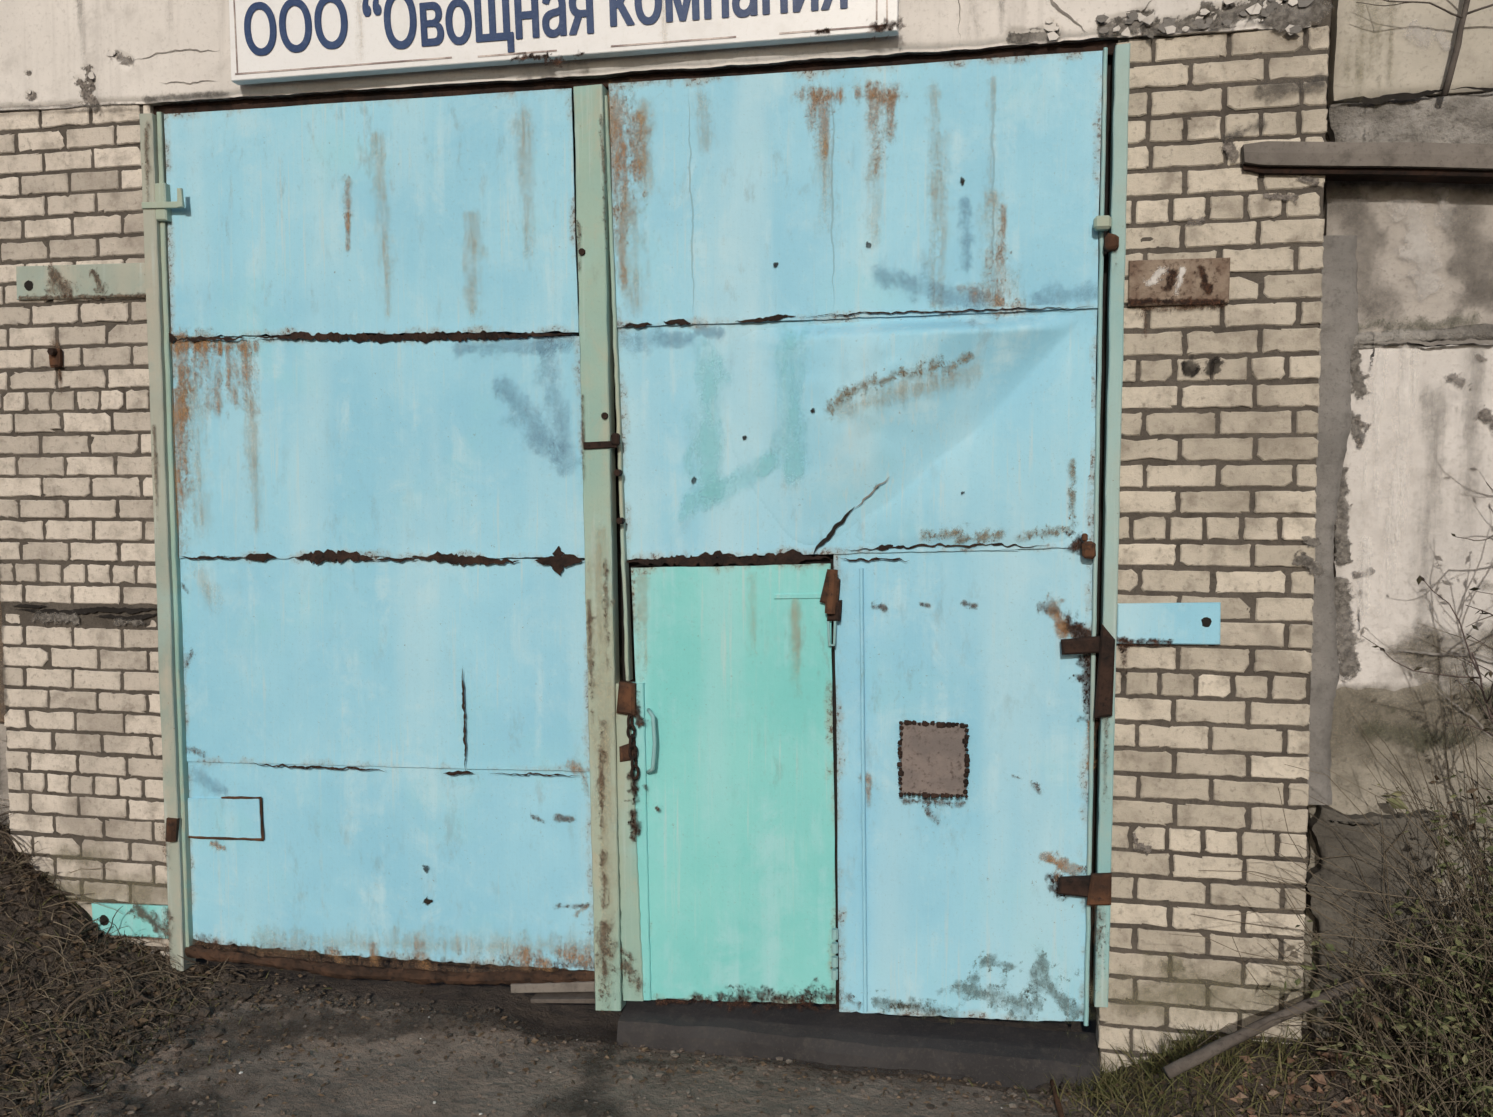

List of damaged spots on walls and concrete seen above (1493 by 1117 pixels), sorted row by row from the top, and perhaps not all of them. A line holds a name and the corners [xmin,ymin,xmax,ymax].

crack [1050,0,1086,32]
spalling [1096,0,1334,38]
rust [810,88,897,156]
water stain [1394,187,1492,302]
rust [195,563,647,1011]
rust [656,978,861,1010]